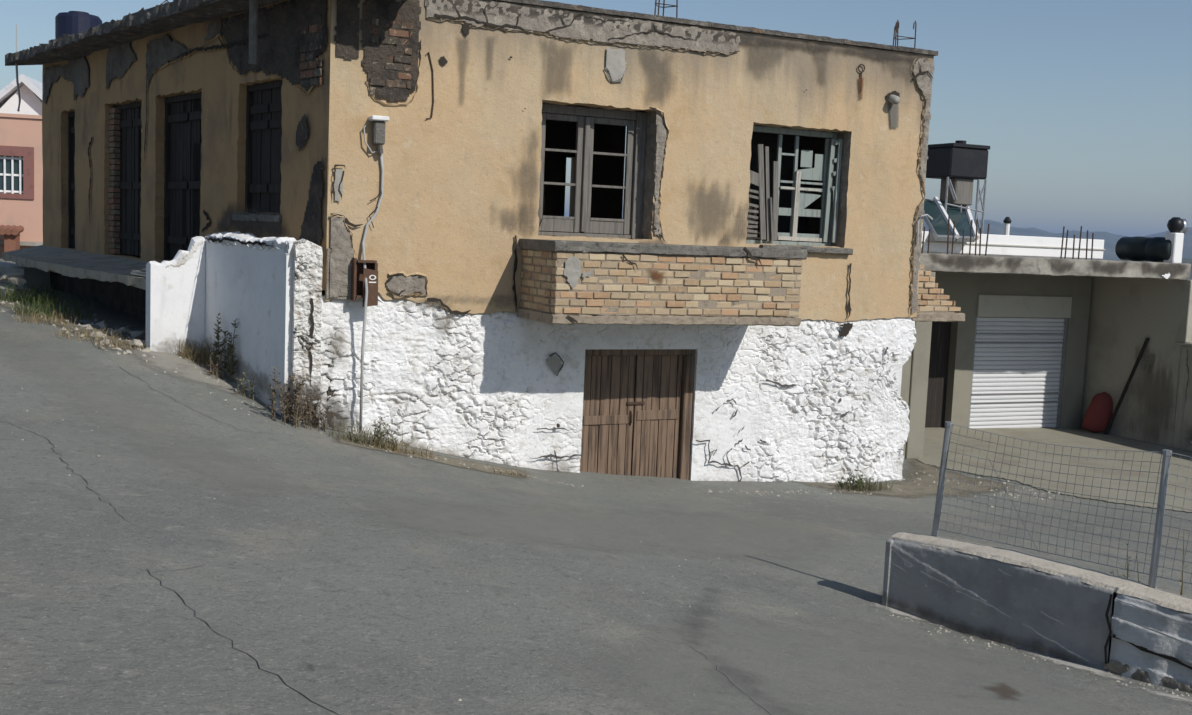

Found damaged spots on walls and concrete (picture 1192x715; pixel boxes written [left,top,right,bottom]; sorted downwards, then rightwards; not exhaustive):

flaking render [43,56,89,104]
flaking render [106,0,327,94]
flaking render [360,0,740,106]
spalling [296,114,308,151]
spalling [654,108,670,237]
flaking render [910,21,961,316]
flaking render [166,158,356,297]
spalling [386,271,429,299]
crack [532,428,582,472]
crack [696,440,749,482]